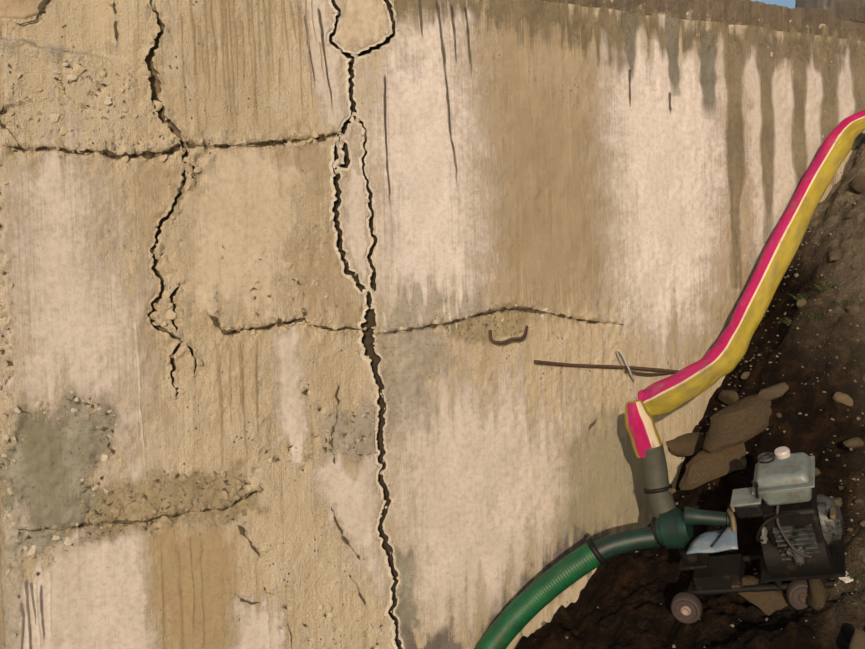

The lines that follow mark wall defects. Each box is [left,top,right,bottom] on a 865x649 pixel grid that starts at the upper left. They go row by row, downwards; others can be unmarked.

crack [0,0,624,649]
damp [394,0,865,281]